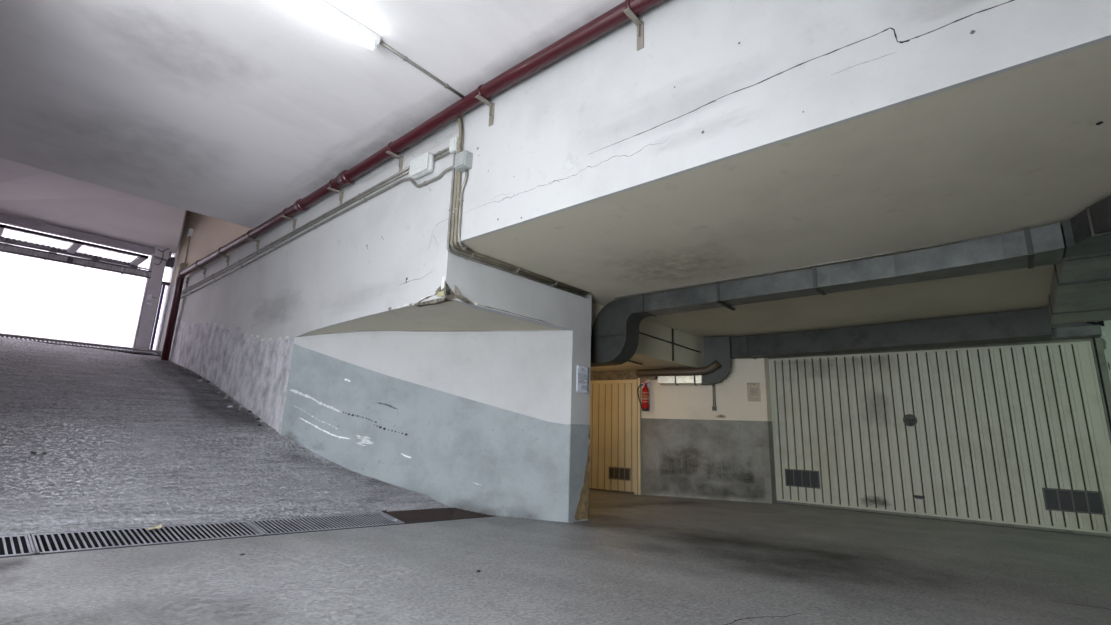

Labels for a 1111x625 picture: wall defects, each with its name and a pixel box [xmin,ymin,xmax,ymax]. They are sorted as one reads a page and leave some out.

crack [430,0,1014,242]